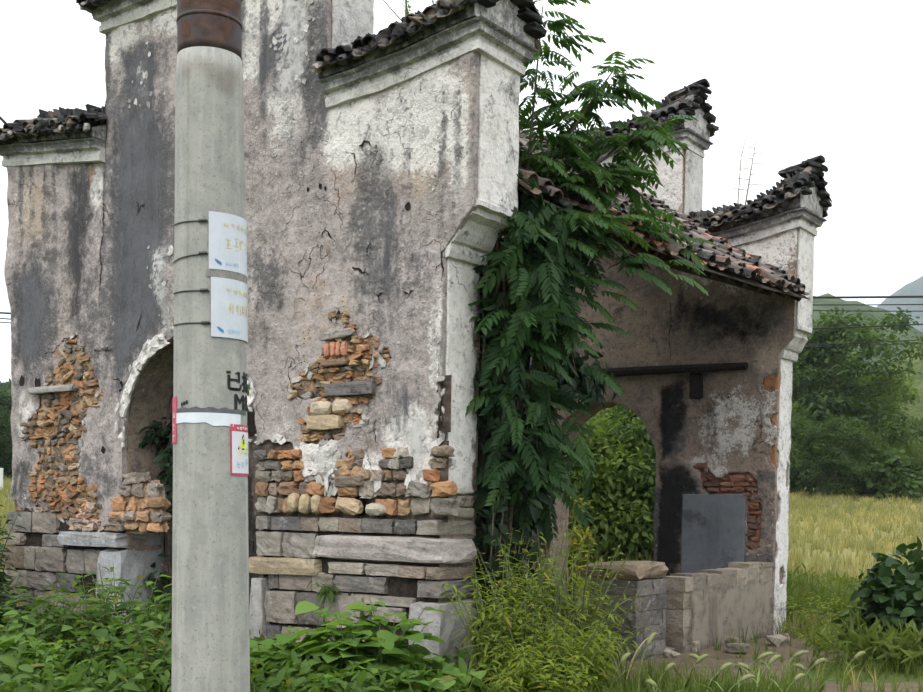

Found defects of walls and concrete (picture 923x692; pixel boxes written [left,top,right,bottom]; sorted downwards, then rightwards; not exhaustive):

damp [259,26,289,87]
damp [69,178,89,316]
damp [112,44,167,392]
crack [346,140,371,183]
crack [352,242,414,300]
crack [435,246,445,281]
peeling [114,245,174,447]
spalling [20,335,172,534]
spalling [247,309,462,523]
damp [657,381,697,578]
spalling [693,463,762,549]
spalling [765,413,778,428]